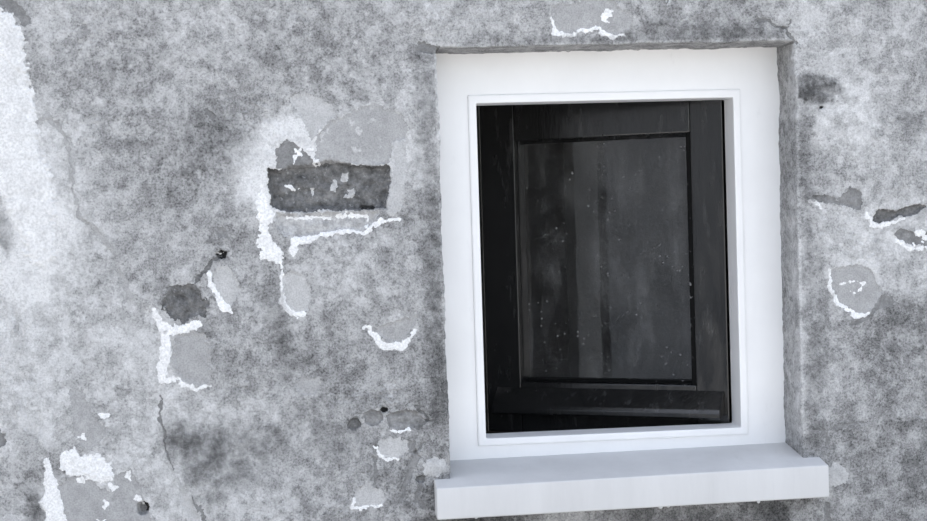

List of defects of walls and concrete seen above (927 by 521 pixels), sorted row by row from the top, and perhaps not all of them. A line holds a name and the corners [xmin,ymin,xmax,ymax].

peeling [550,0,632,40]
flaking render [258,91,408,257]
flaking render [808,186,927,251]
crack [191,255,222,287]
spalling [278,269,311,319]
spalling [827,264,894,326]
spalling [152,266,241,392]
spalling [362,315,420,351]
crack [157,395,175,471]
flaking render [347,407,424,462]
peeling [57,468,152,521]